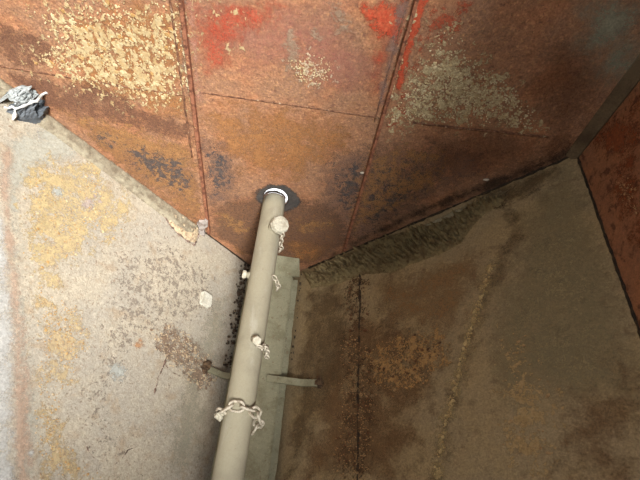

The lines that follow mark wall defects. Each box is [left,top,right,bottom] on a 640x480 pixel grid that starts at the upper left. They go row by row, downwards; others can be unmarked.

rust [0,23,51,70]
rust [71,1,187,116]
peeling [16,0,270,113]
peeling [360,0,549,142]
rust [68,114,201,223]
rust [212,191,268,254]
rust [278,196,344,263]
leakage [320,142,569,244]
rust [11,153,136,480]
rust [150,322,217,390]
rust [333,273,453,480]